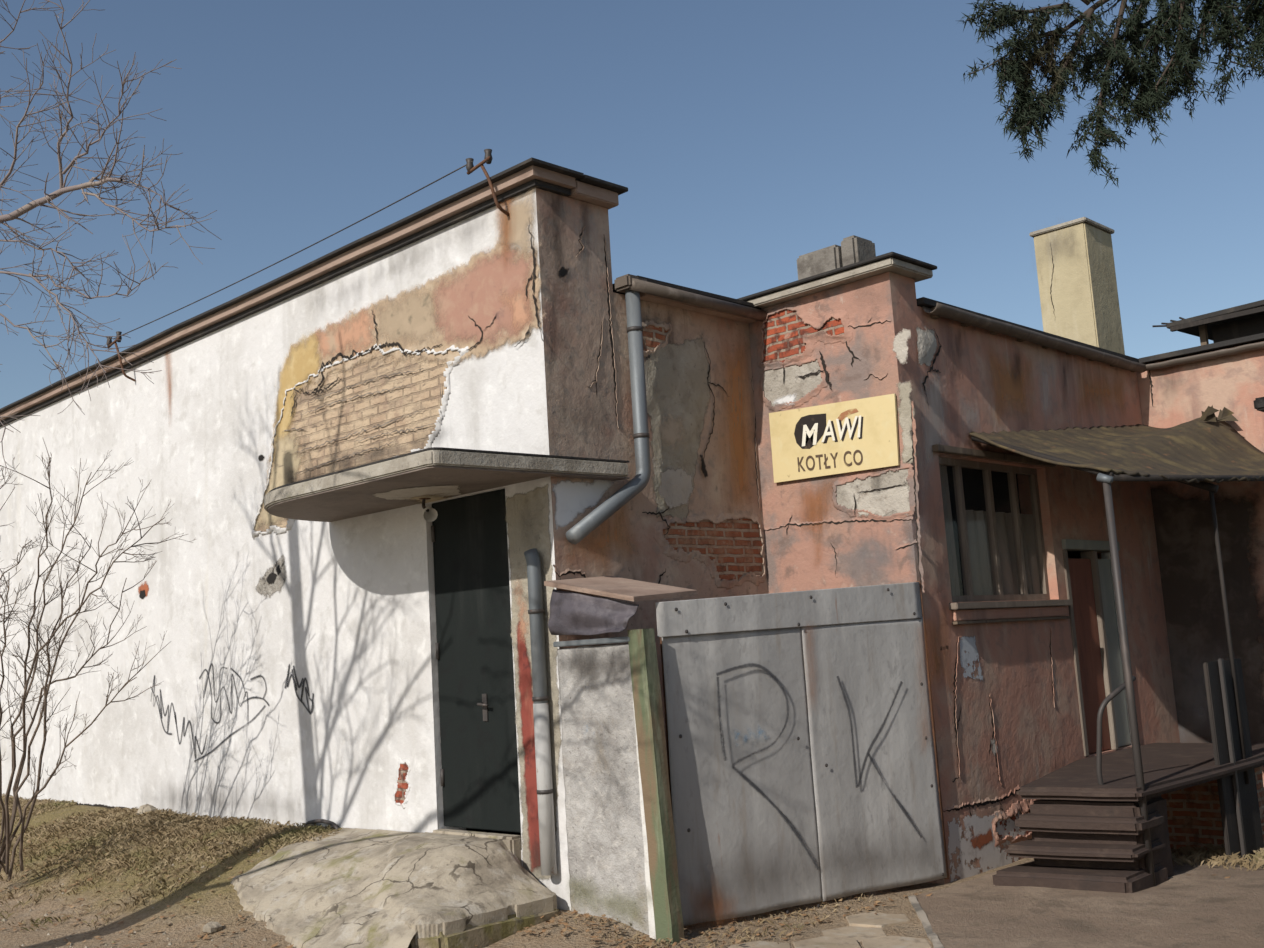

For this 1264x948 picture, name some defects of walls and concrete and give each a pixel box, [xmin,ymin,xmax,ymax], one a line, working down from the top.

crack [290,311,496,417]
peeling [252,195,542,540]
crack [514,221,545,347]
crack [576,226,621,429]
spalling [757,301,853,412]
crack [703,319,942,593]
flaking render [138,581,149,599]
flaking render [256,555,286,597]
spalling [653,509,767,589]
spalling [393,758,411,809]
peeling [948,799,1039,882]